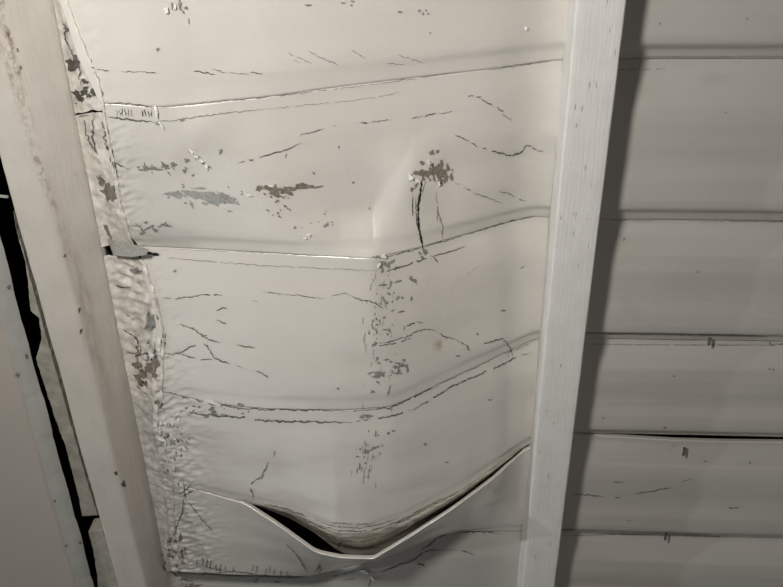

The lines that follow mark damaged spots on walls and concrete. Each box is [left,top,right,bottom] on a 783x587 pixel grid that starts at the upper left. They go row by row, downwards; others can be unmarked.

crack [62,24,454,177]
peeling [137,148,211,177]
peeling [408,150,453,192]
crack [455,135,540,156]
peeling [162,183,322,218]
crack [122,179,534,424]
peeling [132,311,161,386]
peeling [155,399,249,472]
crack [250,452,477,549]
peeling [161,530,186,571]
crack [185,550,322,587]
crack [369,531,497,586]